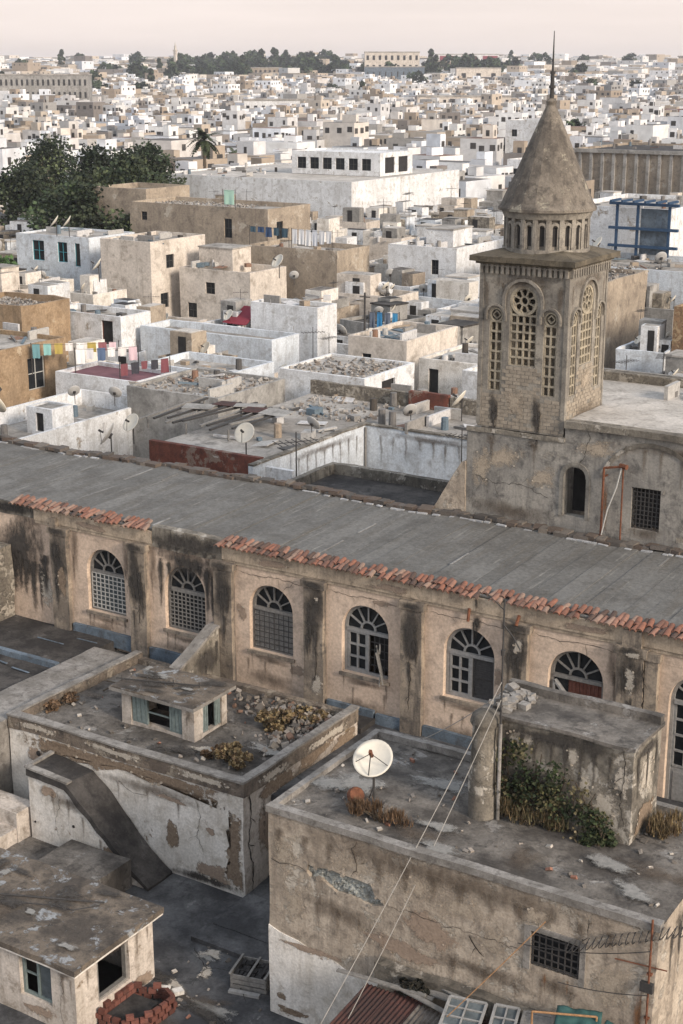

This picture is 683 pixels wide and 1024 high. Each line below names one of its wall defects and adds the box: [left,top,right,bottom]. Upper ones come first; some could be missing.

damp [532,401,540,446]
damp [0,517,76,608]
damp [124,534,230,703]
damp [304,582,323,665]
damp [402,603,419,689]
peeling [20,722,243,892]
spalling [259,807,269,849]
crack [248,795,305,884]
peeling [579,751,655,836]
spalling [304,861,384,907]